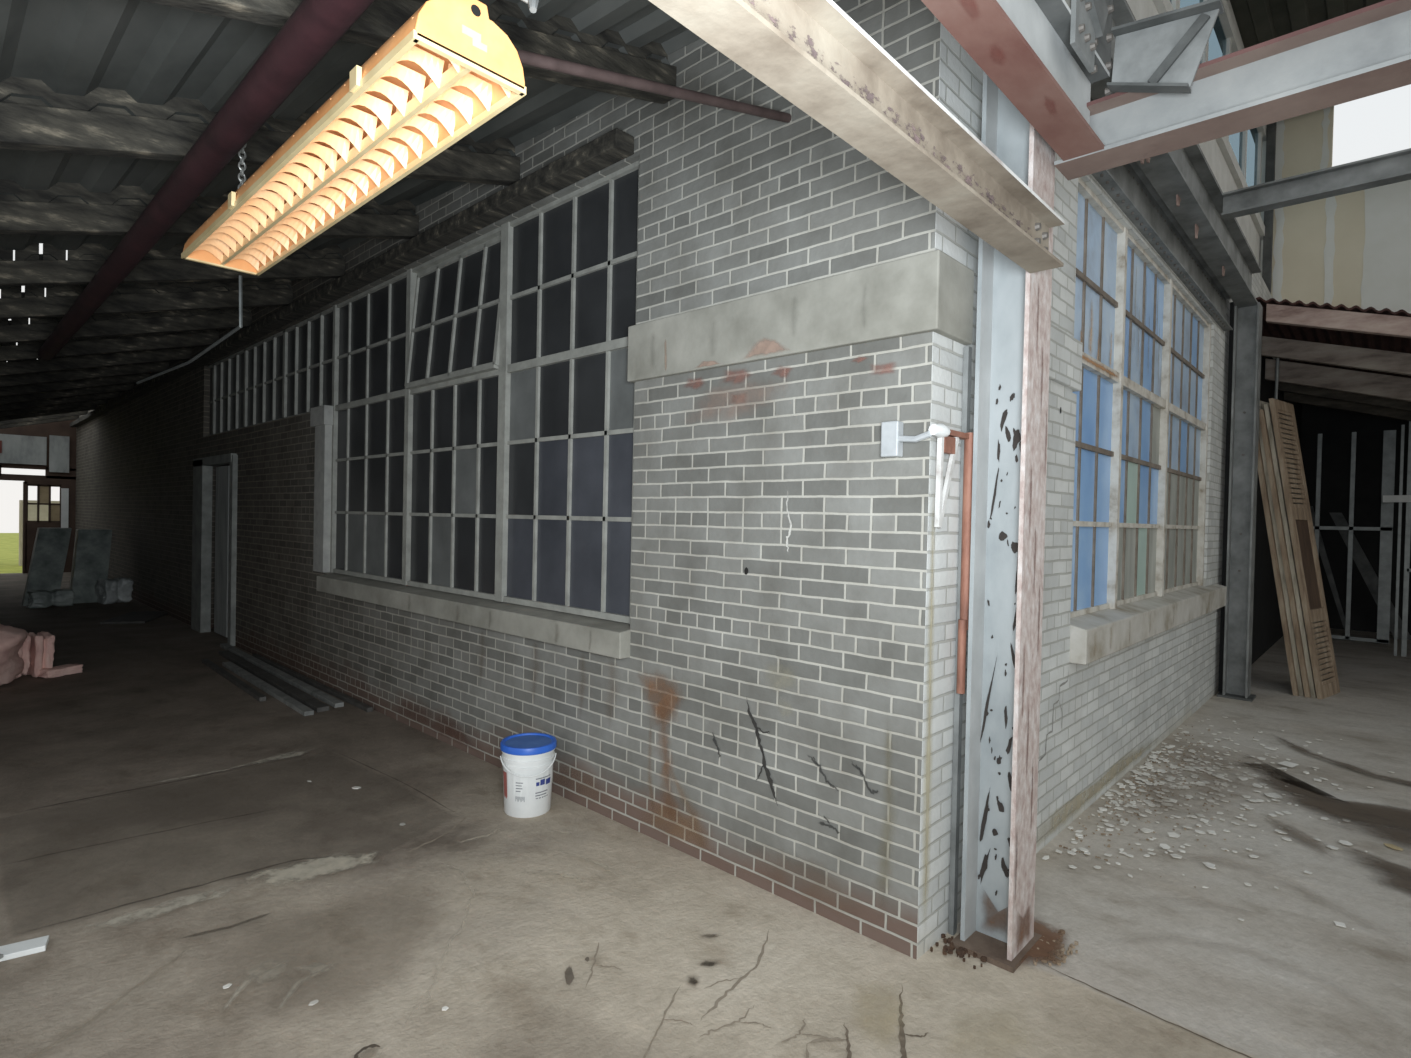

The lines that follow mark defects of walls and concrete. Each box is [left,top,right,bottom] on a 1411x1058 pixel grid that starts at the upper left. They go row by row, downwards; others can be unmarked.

peeling [769,15,1032,237]
peeling [978,385,1021,895]
crack [746,696,777,803]
crack [811,757,878,834]
crack [586,943,621,986]
crack [643,930,831,1058]
crack [898,987,927,1058]
rust [986,896,1064,961]